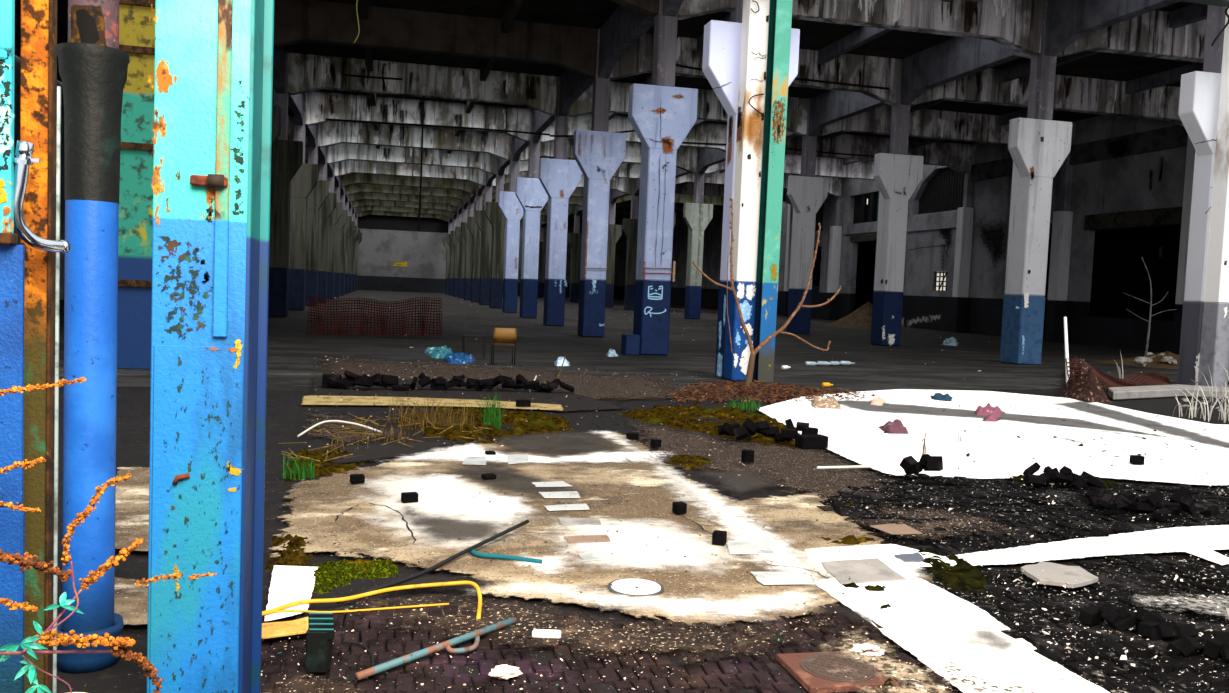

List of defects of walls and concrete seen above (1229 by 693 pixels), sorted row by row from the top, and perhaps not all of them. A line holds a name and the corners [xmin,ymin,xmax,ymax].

damp [859,0,876,21]
damp [934,0,979,34]
peeling [0,48,14,170]
corrosion [148,58,177,93]
corrosion [151,109,180,225]
corrosion [662,137,673,153]
corrosion [727,107,743,164]
damp [800,57,843,84]
damp [1010,75,1029,102]
peeling [157,236,213,342]
peeling [716,283,756,377]
spalling [155,357,241,693]